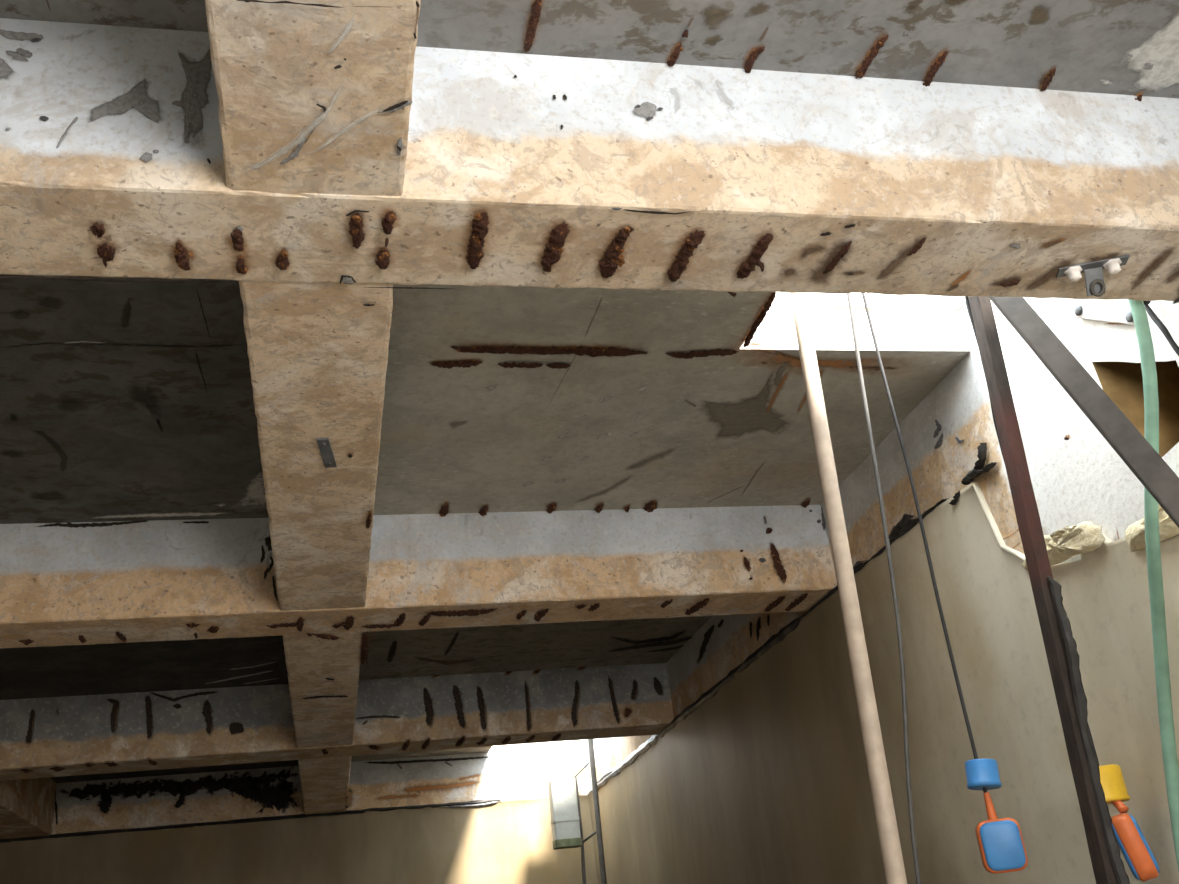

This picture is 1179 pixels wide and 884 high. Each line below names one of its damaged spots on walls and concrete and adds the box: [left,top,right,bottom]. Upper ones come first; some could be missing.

crack [236,0,381,8]
peeling [0,29,43,79]
peeling [56,49,219,148]
crack [377,101,412,113]
crack [280,104,326,164]
rust [466,212,489,269]
rust [541,223,570,272]
rust [599,227,634,279]
rust [667,230,705,282]
rust [737,233,773,279]
rust [665,292,777,359]
rust [431,345,648,369]